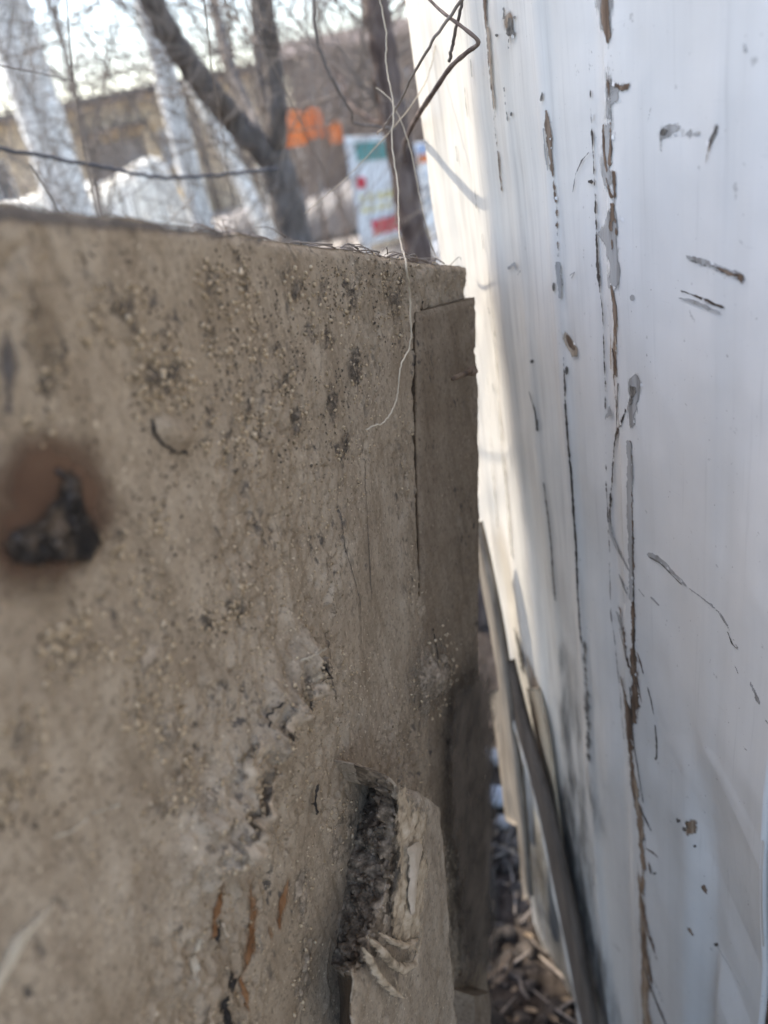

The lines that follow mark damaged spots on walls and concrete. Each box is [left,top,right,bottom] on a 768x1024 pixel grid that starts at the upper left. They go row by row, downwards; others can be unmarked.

peeling [595,0,614,43]
peeling [597,66,629,291]
peeling [561,330,577,357]
peeling [627,374,643,428]
peeling [616,607,666,1024]